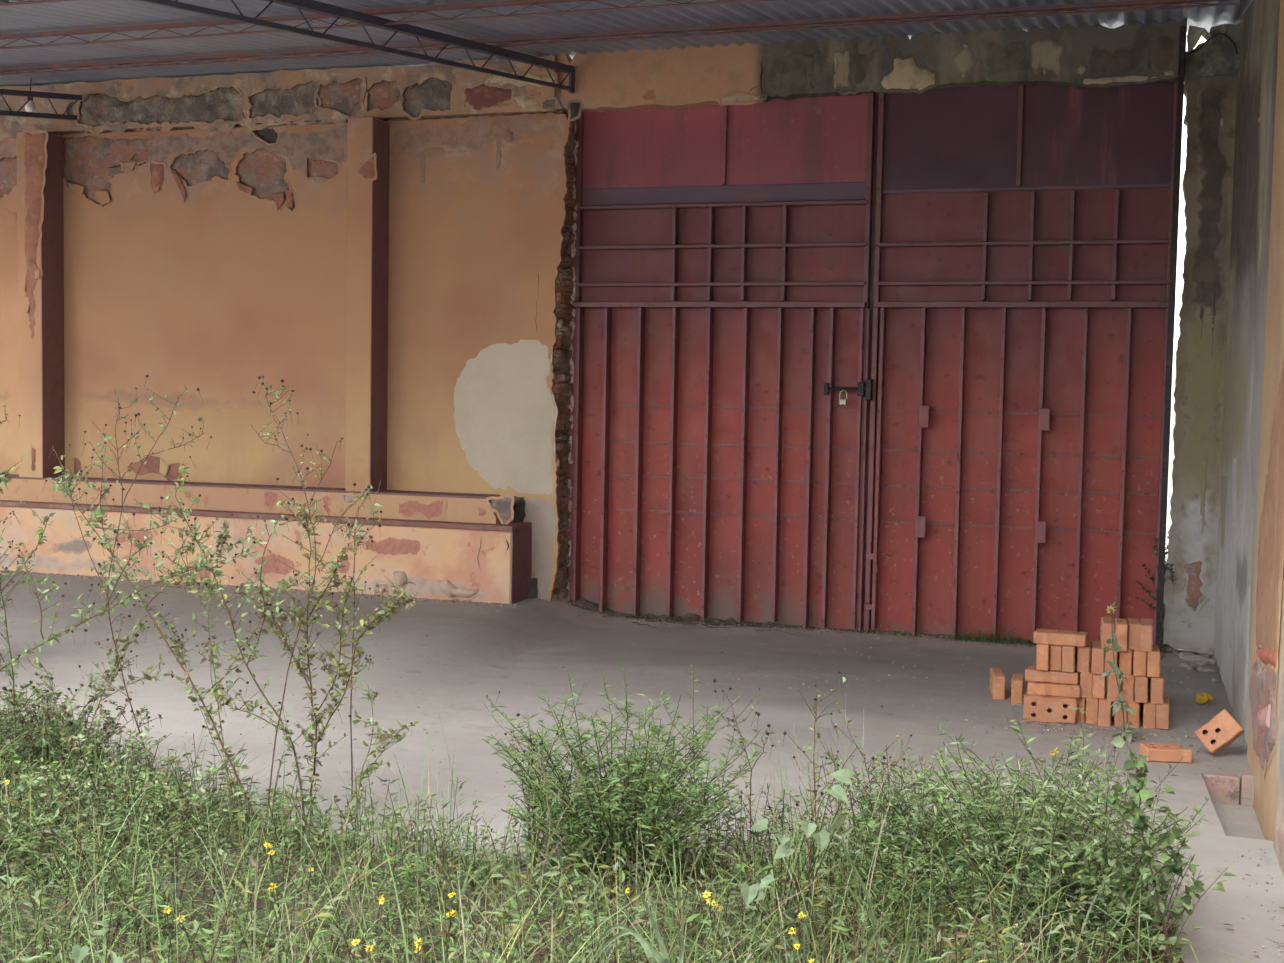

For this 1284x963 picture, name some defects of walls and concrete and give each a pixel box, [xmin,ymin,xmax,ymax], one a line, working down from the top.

peeling [836,54,938,95]
peeling [1079,67,1177,87]
leakage [1187,24,1267,359]
flaking render [0,66,583,601]
flaking render [1179,558,1209,617]